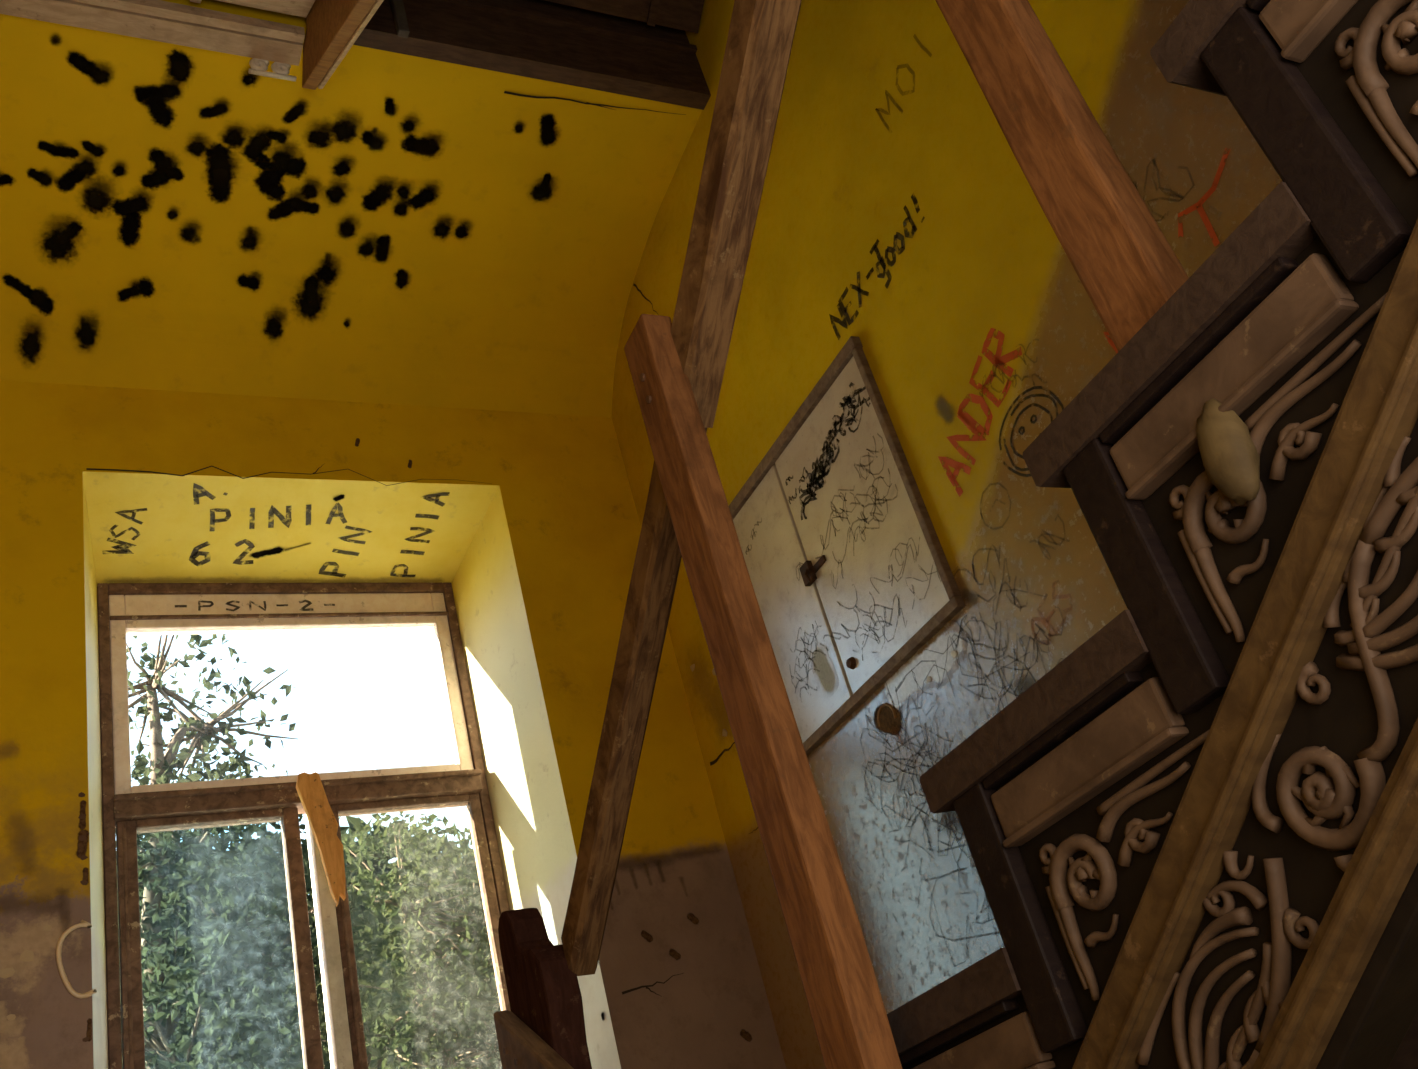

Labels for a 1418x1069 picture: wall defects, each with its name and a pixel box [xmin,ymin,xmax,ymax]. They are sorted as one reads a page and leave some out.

peeling [874,623,967,735]
peeling [0,903,87,1069]
flaking render [82,1018,92,1042]